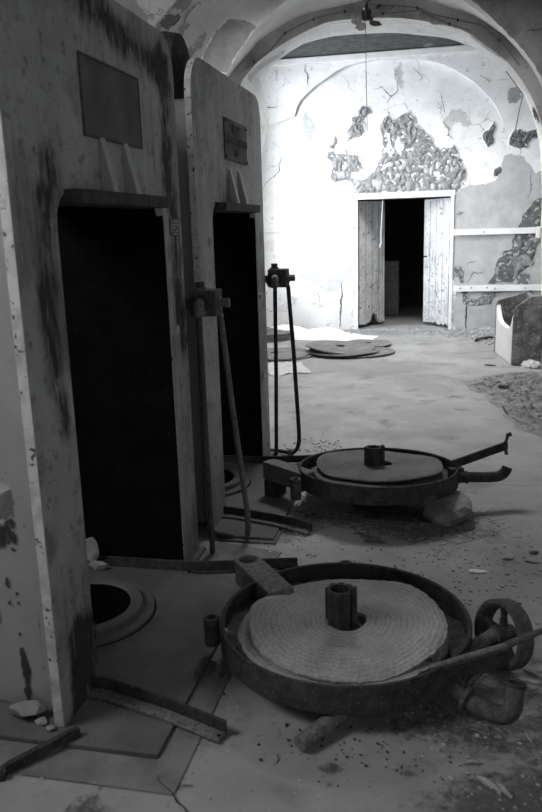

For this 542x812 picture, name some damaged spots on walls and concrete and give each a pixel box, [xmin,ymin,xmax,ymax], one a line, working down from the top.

peeling [115,0,193,36]
peeling [187,19,256,73]
peeling [326,104,542,329]
crack [157,774,188,812]